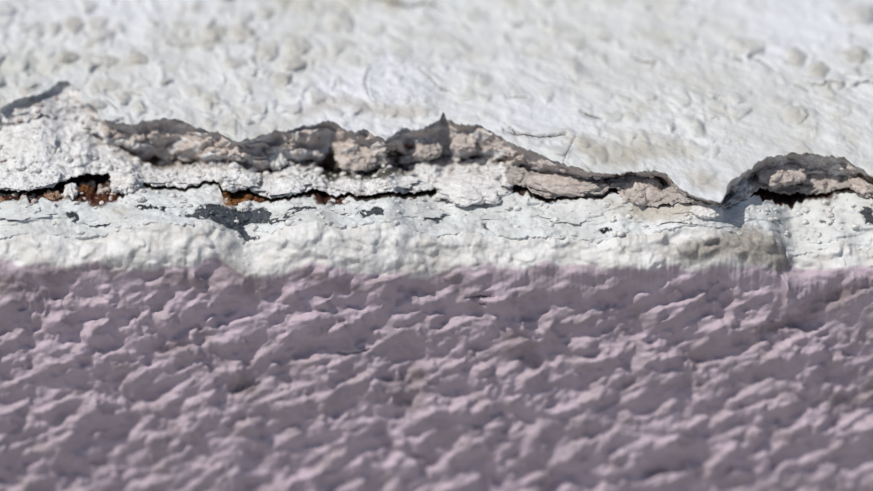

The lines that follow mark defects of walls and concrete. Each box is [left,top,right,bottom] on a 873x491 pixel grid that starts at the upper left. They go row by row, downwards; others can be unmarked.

peeling [363,55,435,100]
crack [143,174,221,192]
spalling [0,81,873,270]
corrosion [0,180,117,207]
corrosion [223,194,266,213]
corrosion [314,194,343,205]
crack [267,191,438,203]
crack [514,190,617,203]